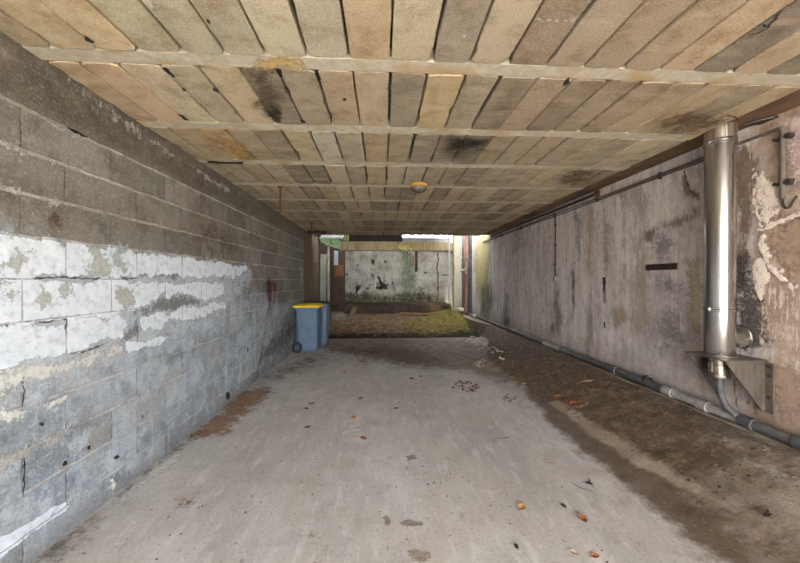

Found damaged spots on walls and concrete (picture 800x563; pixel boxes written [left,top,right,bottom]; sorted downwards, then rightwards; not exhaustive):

damp [247,58,303,122]
damp [661,111,724,134]
damp [553,169,594,184]
flaking render [789,138,800,191]
flaking render [751,167,800,301]
crack [433,253,441,301]
peeling [0,231,253,407]